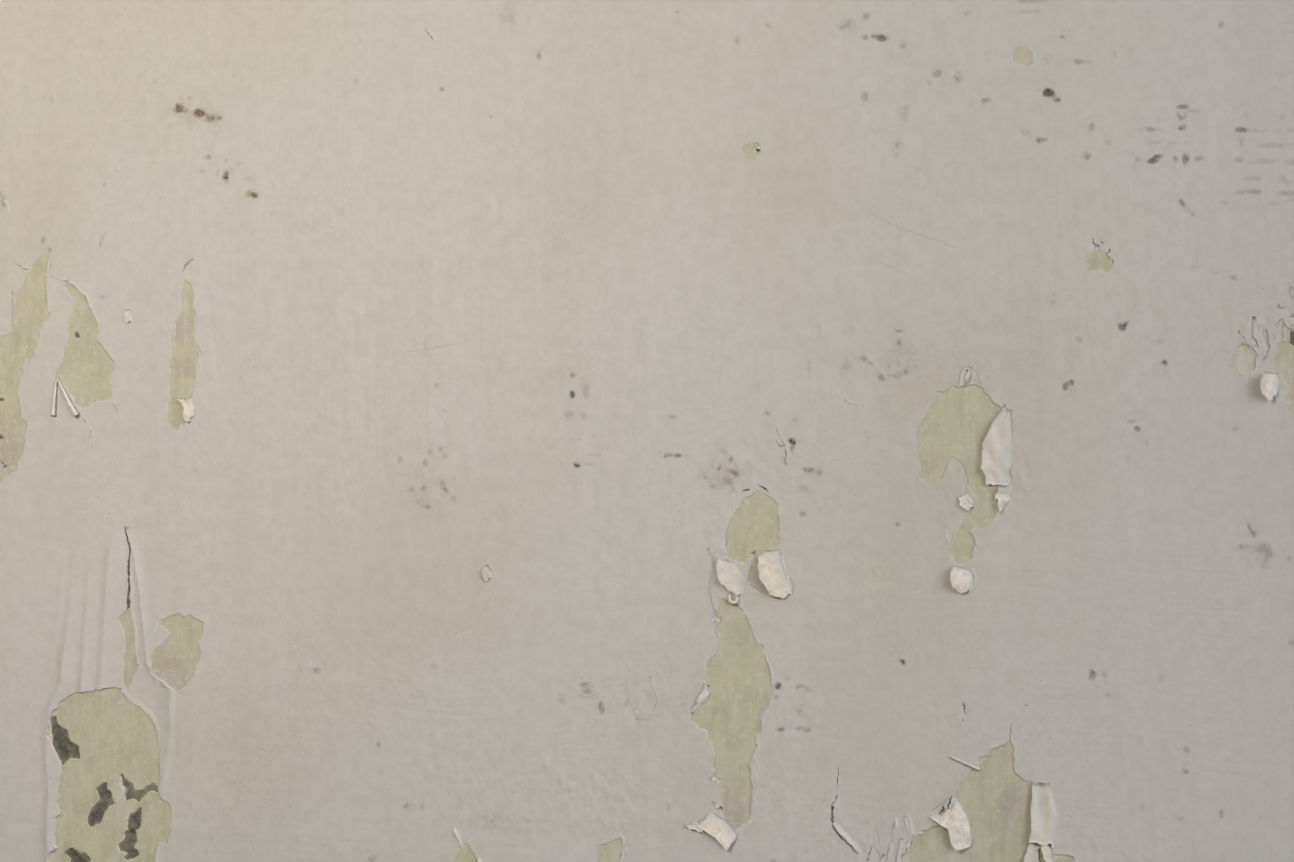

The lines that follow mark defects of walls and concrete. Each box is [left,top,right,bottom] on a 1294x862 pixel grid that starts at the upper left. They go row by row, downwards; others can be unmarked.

peeling [0,248,117,483]
peeling [167,280,202,430]
peeling [1230,286,1294,415]
peeling [913,366,1013,593]
peeling [48,608,204,862]
peeling [685,489,793,850]
peeling [880,721,1074,862]